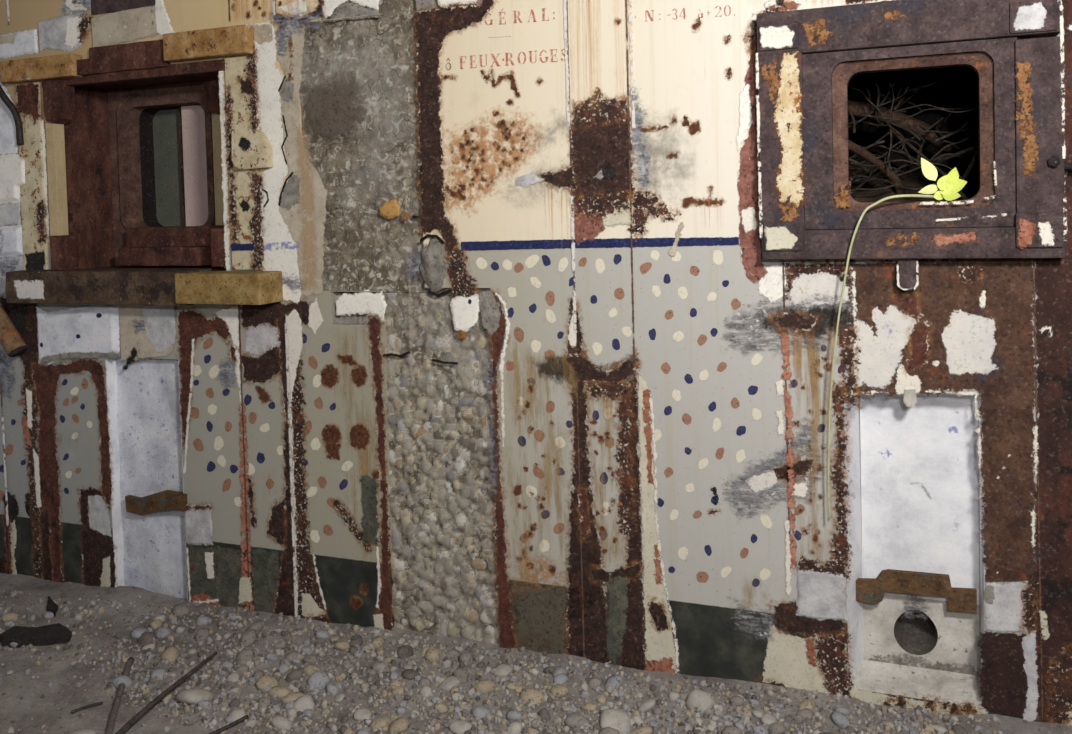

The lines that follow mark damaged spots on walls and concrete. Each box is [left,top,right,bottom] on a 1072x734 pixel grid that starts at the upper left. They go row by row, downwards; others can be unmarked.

corrosion [232,0,325,25]
corrosion [723,0,800,283]
corrosion [0,296,113,582]
corrosion [266,498,289,547]
corrosion [320,314,393,630]
spalling [246,0,500,644]
corrosion [414,0,724,670]
peeling [758,332,988,715]
corrosion [769,0,1072,726]